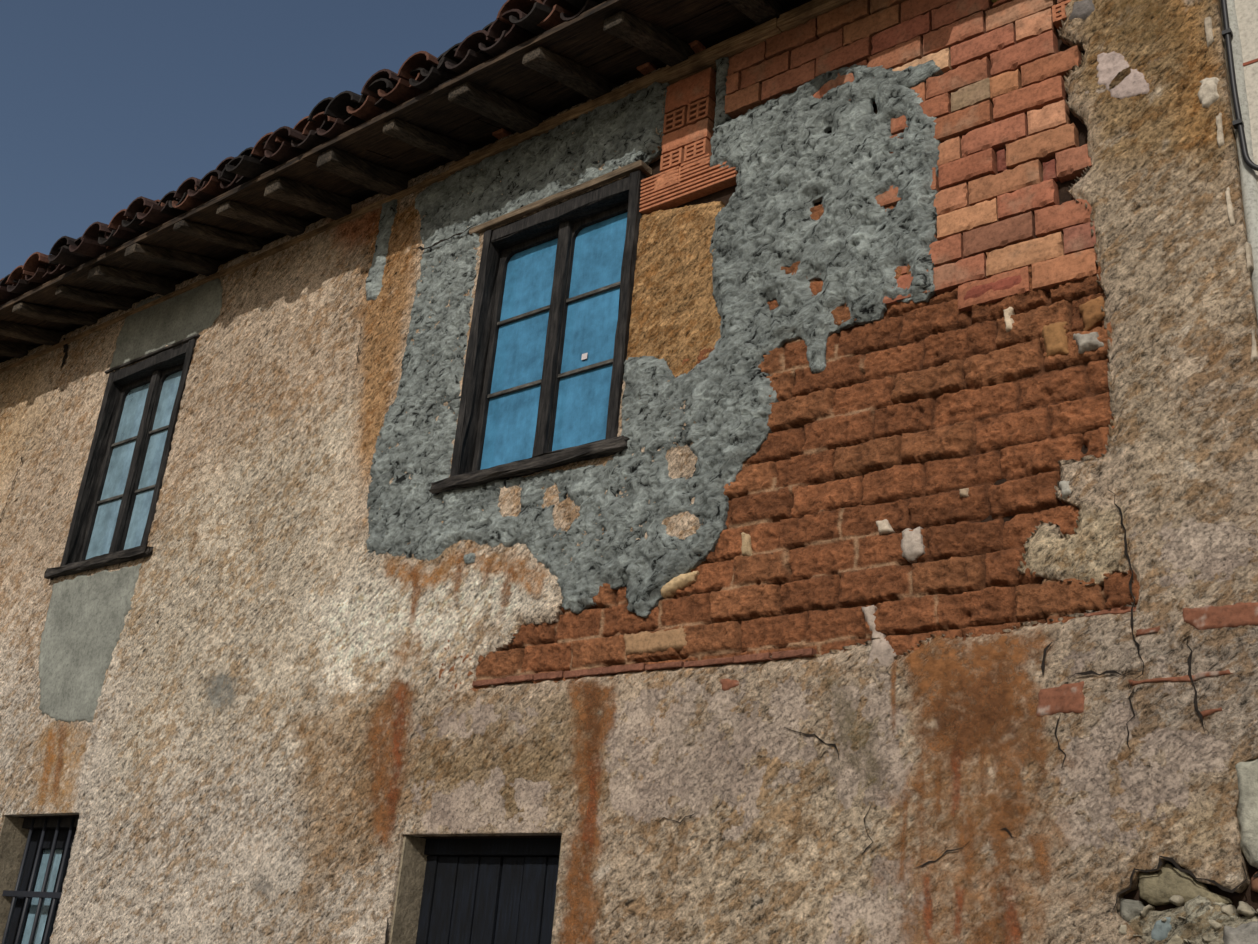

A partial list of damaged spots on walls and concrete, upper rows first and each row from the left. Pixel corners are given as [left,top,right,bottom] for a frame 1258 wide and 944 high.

flaking render [639,0,1150,312]
corrosion [369,682,413,843]
corrosion [562,681,615,944]
corrosion [891,629,1045,944]
crack [1054,714,1066,769]
crack [1041,489,1144,752]
spalling [1118,758,1258,944]
crack [1186,639,1205,732]